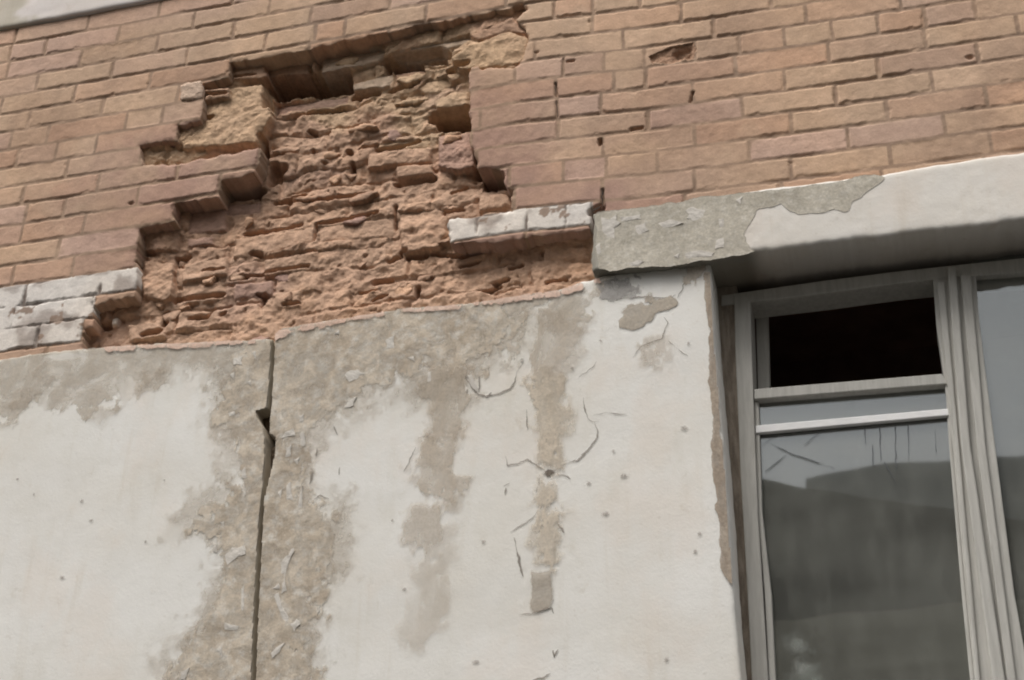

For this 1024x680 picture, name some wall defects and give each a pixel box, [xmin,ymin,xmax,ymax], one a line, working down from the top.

spalling [650,43,697,64]
peeling [595,174,885,271]
peeling [0,353,46,425]
leakage [102,340,255,352]
spalling [44,9,595,680]
leakage [275,311,384,340]
leakage [418,365,472,501]
crack [465,363,523,398]
leakage [402,278,601,468]
crack [505,362,623,576]
peeling [619,295,678,330]
leakage [530,483,559,612]